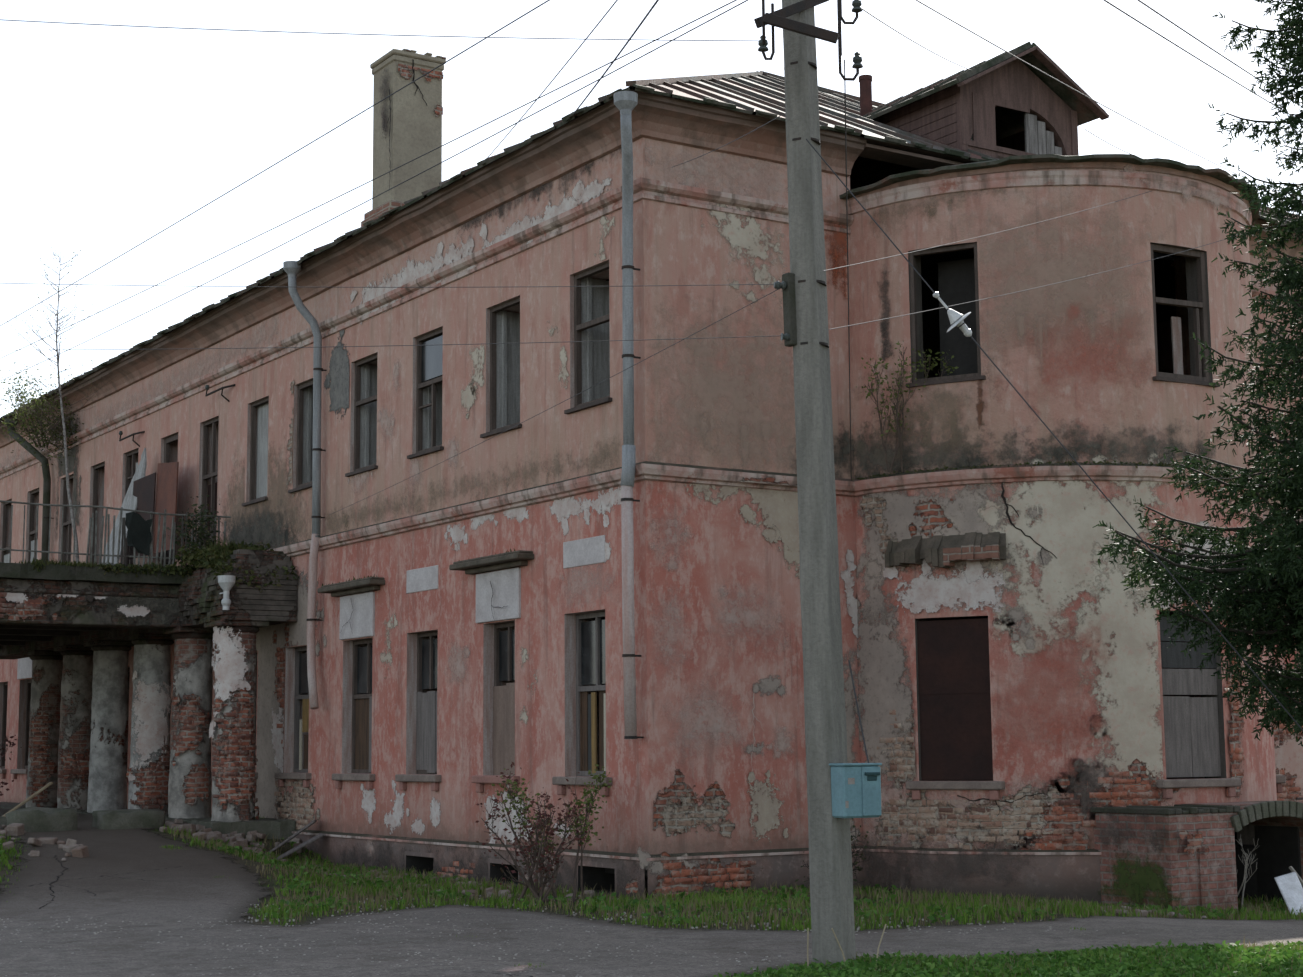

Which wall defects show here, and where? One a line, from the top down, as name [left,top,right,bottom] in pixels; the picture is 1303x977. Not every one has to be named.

peeling [350,178,611,325]
peeling [701,203,784,302]
spalling [324,329,350,419]
peeling [461,344,484,419]
damp [833,392,1214,479]
peeling [685,476,800,578]
crack [1001,482,1057,562]
spalling [0,592,150,622]
peeling [840,480,1245,850]
spalling [26,708,90,803]
peeling [360,780,442,835]
spalling [625,727,792,899]